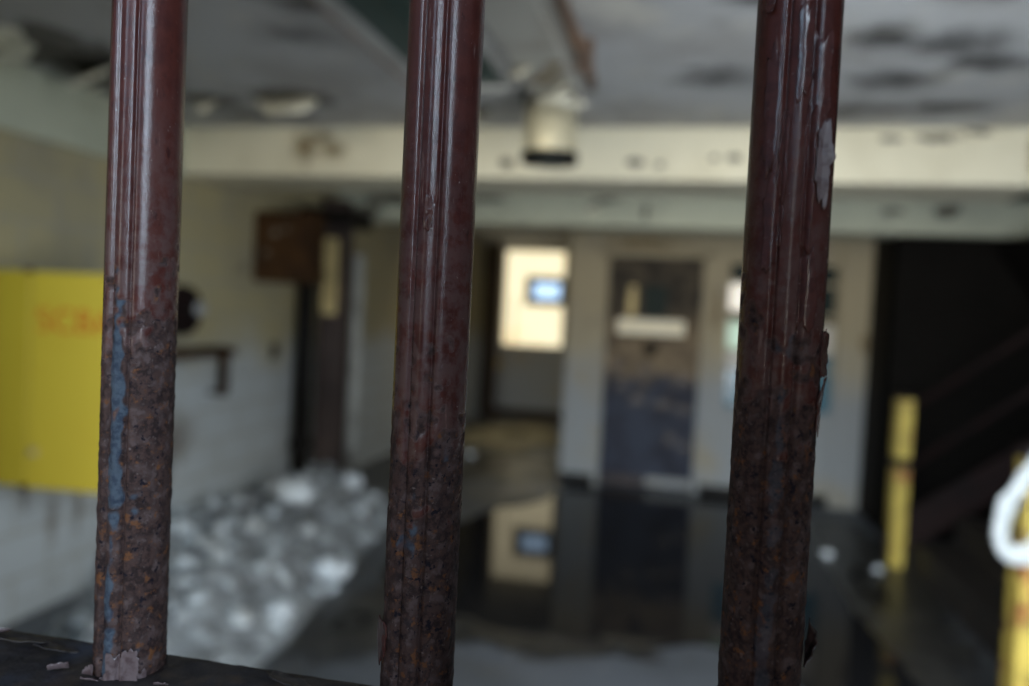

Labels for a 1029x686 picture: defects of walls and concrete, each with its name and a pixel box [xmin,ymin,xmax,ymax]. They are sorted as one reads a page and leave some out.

peeling [761,1,836,274]
peeling [796,246,830,437]
peeling [81,648,147,681]